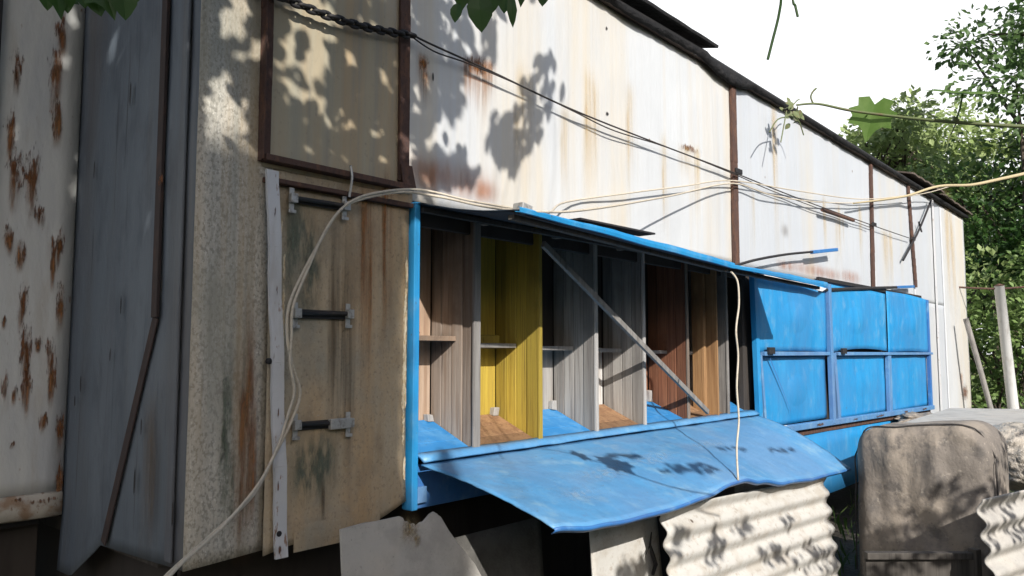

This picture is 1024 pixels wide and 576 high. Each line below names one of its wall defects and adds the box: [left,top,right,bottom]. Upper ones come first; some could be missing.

corrosion [47,14,66,139]
corrosion [3,112,44,219]
corrosion [5,224,26,267]
corrosion [50,230,65,321]
corrosion [1,290,57,409]
corrosion [38,412,64,438]